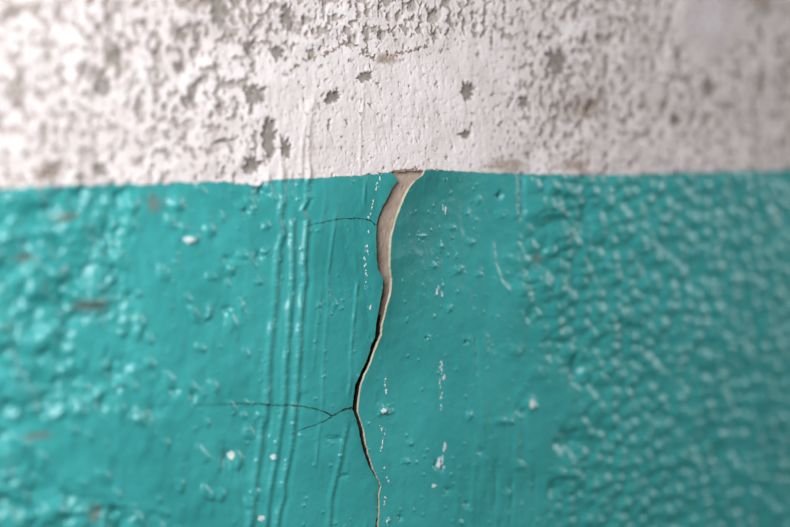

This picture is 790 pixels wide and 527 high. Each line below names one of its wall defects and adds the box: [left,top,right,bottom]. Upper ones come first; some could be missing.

crack [206,314,381,527]